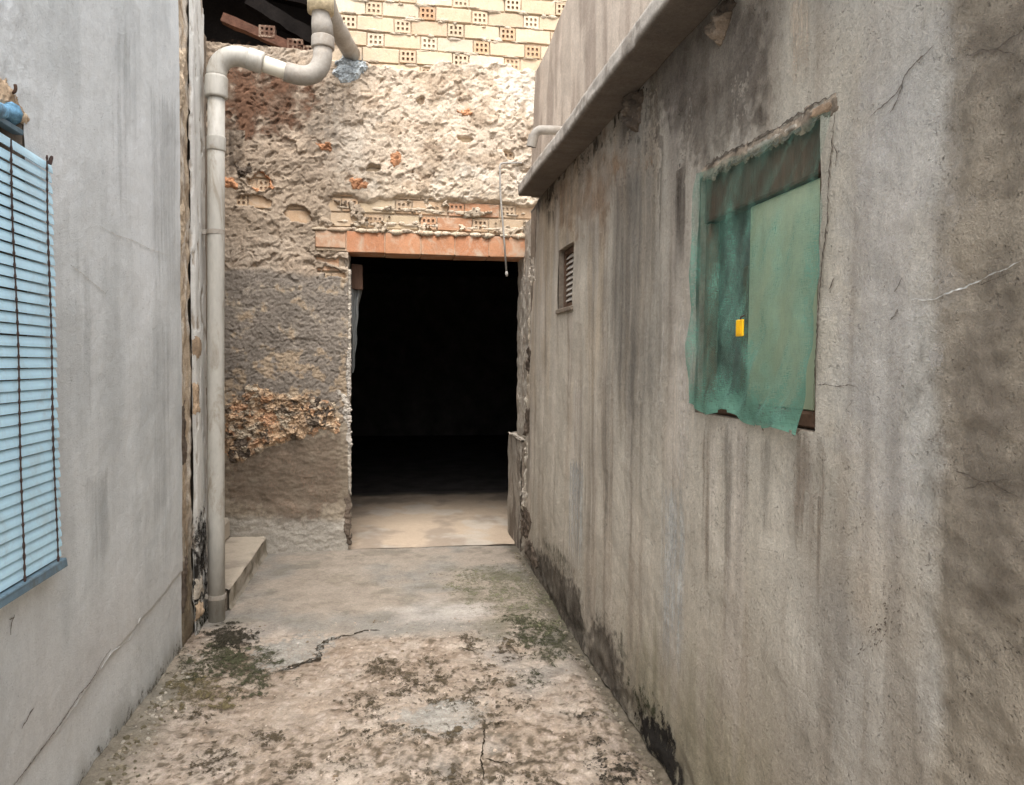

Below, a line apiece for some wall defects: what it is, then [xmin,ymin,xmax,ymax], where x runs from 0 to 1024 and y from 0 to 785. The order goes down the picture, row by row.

crack [873,48,931,114]
spalling [316,142,332,152]
spalling [349,177,369,190]
spalling [390,151,401,167]
spalling [702,93,839,181]
crack [912,261,1020,300]
spalling [225,269,353,545]
leakage [192,509,208,634]
crack [272,630,369,672]
leakage [530,546,683,785]